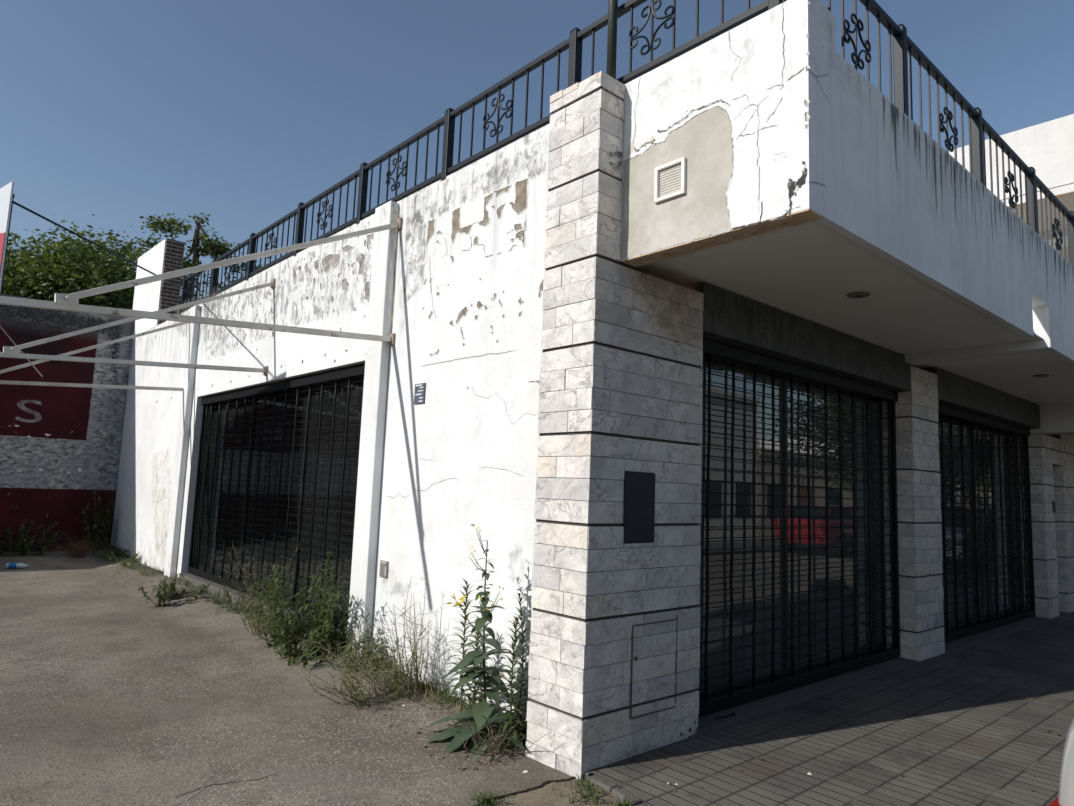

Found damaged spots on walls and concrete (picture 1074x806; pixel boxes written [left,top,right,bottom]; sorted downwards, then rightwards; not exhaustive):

crack [728,0,829,229]
peeling [427,177,529,263]
spalling [621,99,734,259]
peeling [208,225,374,348]
peeling [450,291,505,347]
crack [472,776,575,806]